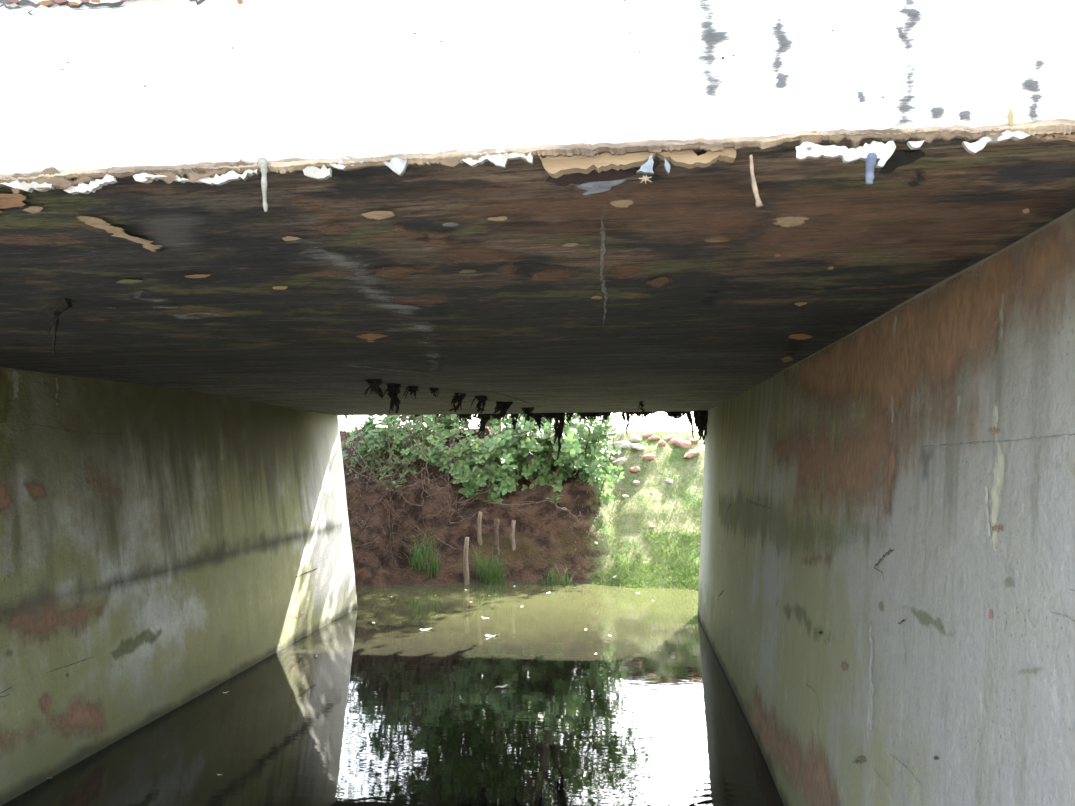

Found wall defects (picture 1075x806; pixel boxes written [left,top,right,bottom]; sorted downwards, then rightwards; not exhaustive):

spalling [0,166,117,213]
peeling [133,159,260,186]
peeling [303,160,363,180]
peeling [384,158,407,176]
spalling [440,148,736,208]
peeling [795,129,1075,187]
spalling [361,211,395,220]